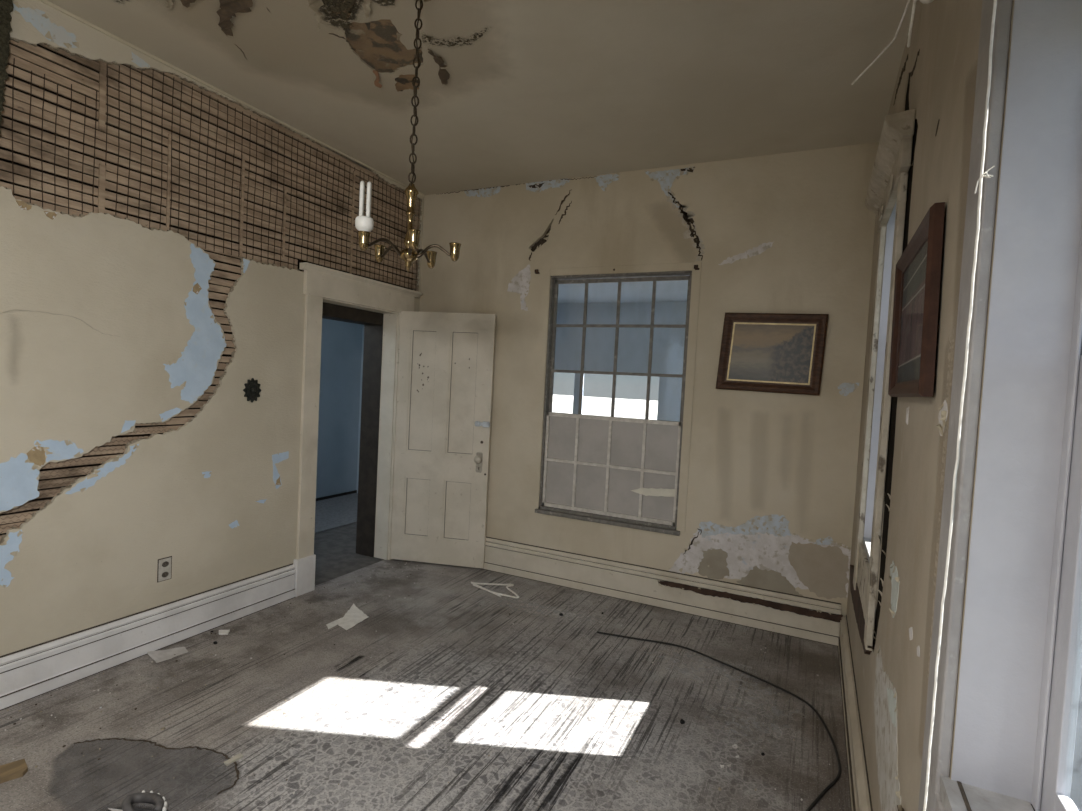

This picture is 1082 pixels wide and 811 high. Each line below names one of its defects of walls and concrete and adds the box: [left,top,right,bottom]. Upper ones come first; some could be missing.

crack [439,177,594,261]
crack [666,192,705,261]
flaking render [0,0,423,588]
peeling [658,514,851,622]